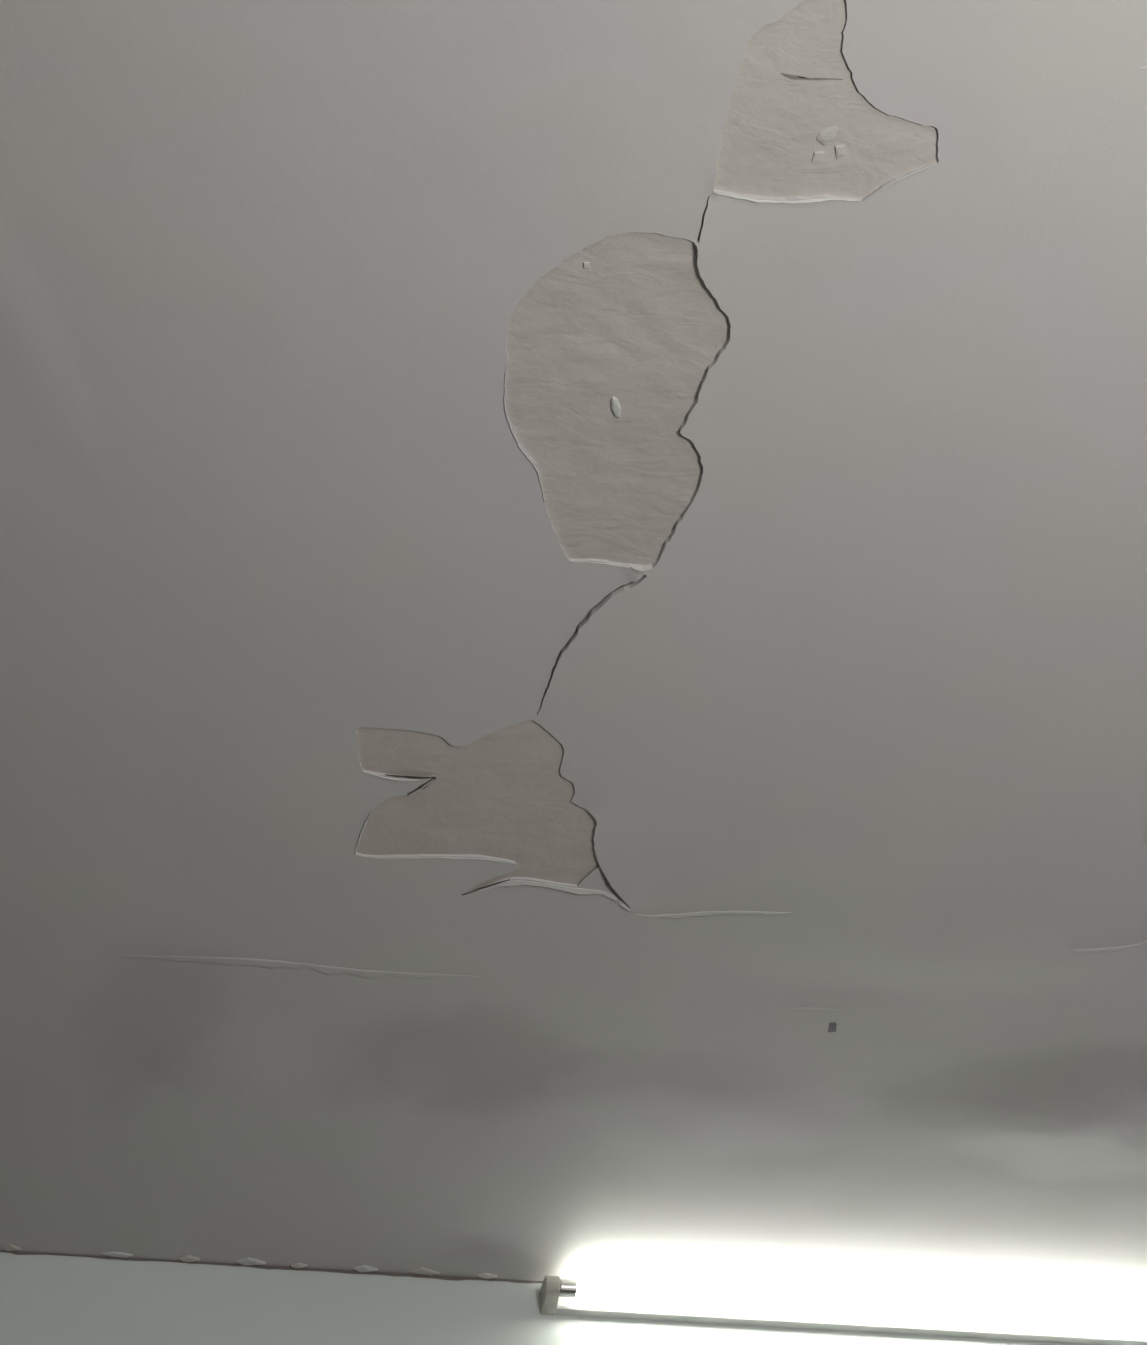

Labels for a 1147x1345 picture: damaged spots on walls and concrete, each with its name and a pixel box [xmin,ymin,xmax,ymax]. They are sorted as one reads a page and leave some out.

peeling [713,0,938,204]
crack [537,582,633,714]
peeling [355,720,632,911]